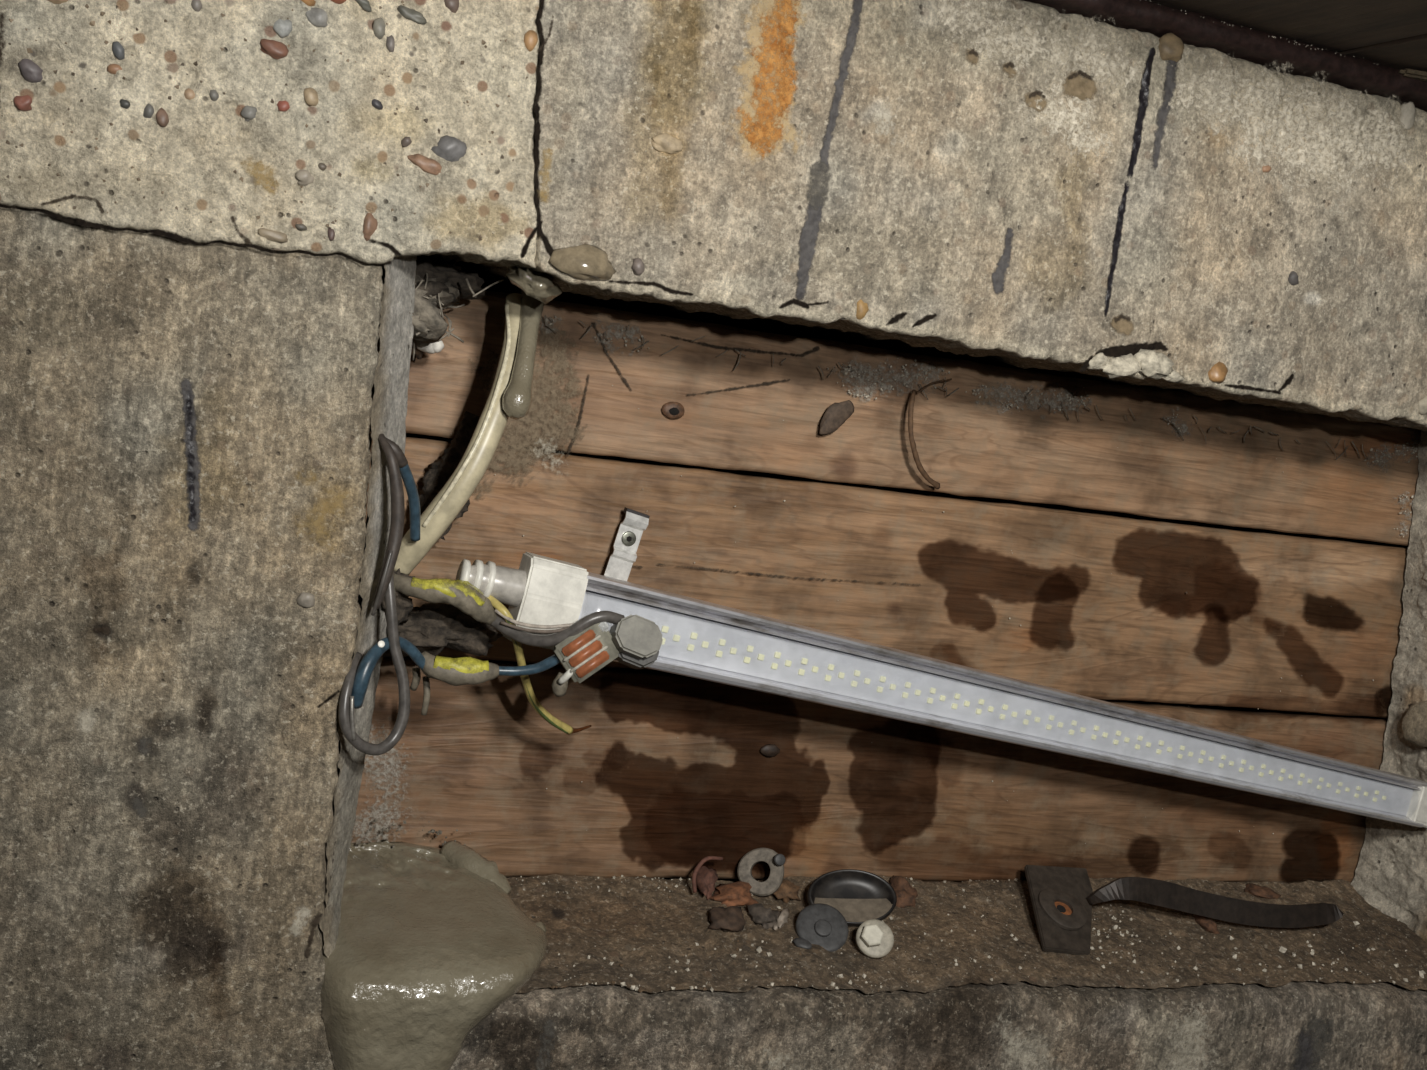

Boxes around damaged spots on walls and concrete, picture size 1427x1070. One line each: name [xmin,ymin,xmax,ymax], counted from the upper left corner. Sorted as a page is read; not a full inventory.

crack [521,0,554,258]
rust [738,0,802,157]
crack [0,194,402,265]
leakage [920,541,1089,648]
leakage [1114,530,1258,664]
leakage [1266,595,1363,696]
leakage [597,669,830,871]
leakage [850,719,939,852]